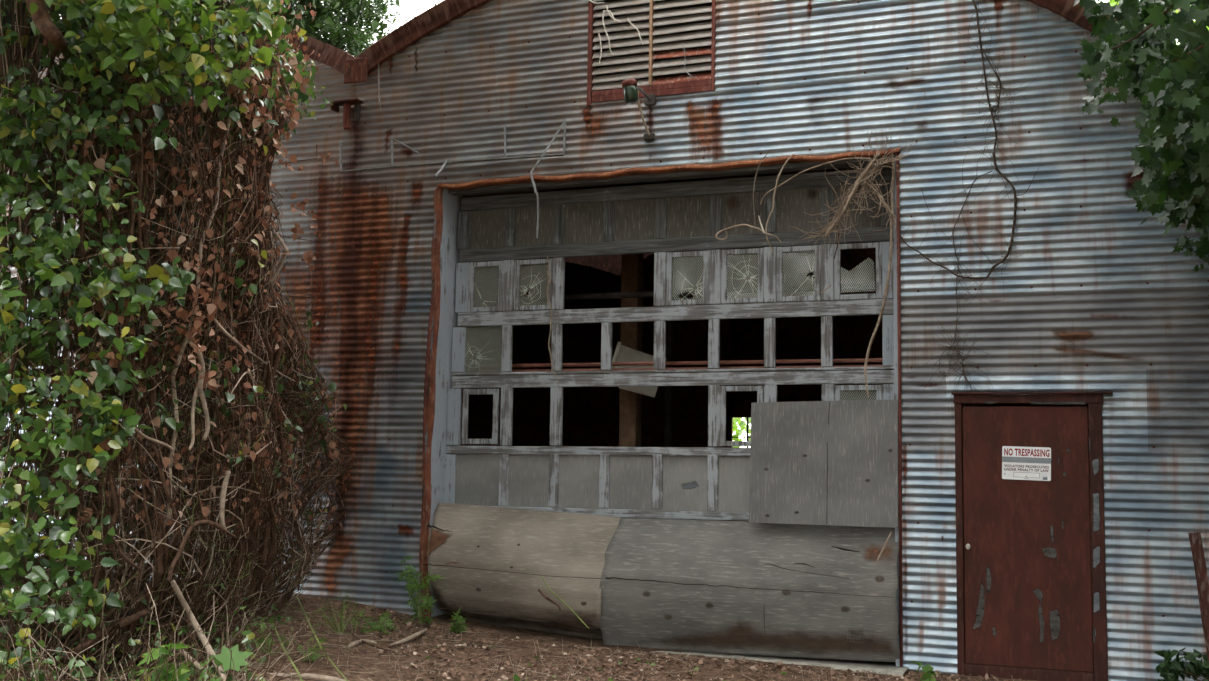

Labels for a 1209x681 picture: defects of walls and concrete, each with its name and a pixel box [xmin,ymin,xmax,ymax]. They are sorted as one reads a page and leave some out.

rust [582,107,604,140]
rust [688,100,723,160]
rust [285,113,422,595]
rust [1054,331,1130,359]
peeling [971,566,997,636]
peeling [1033,588,1060,643]